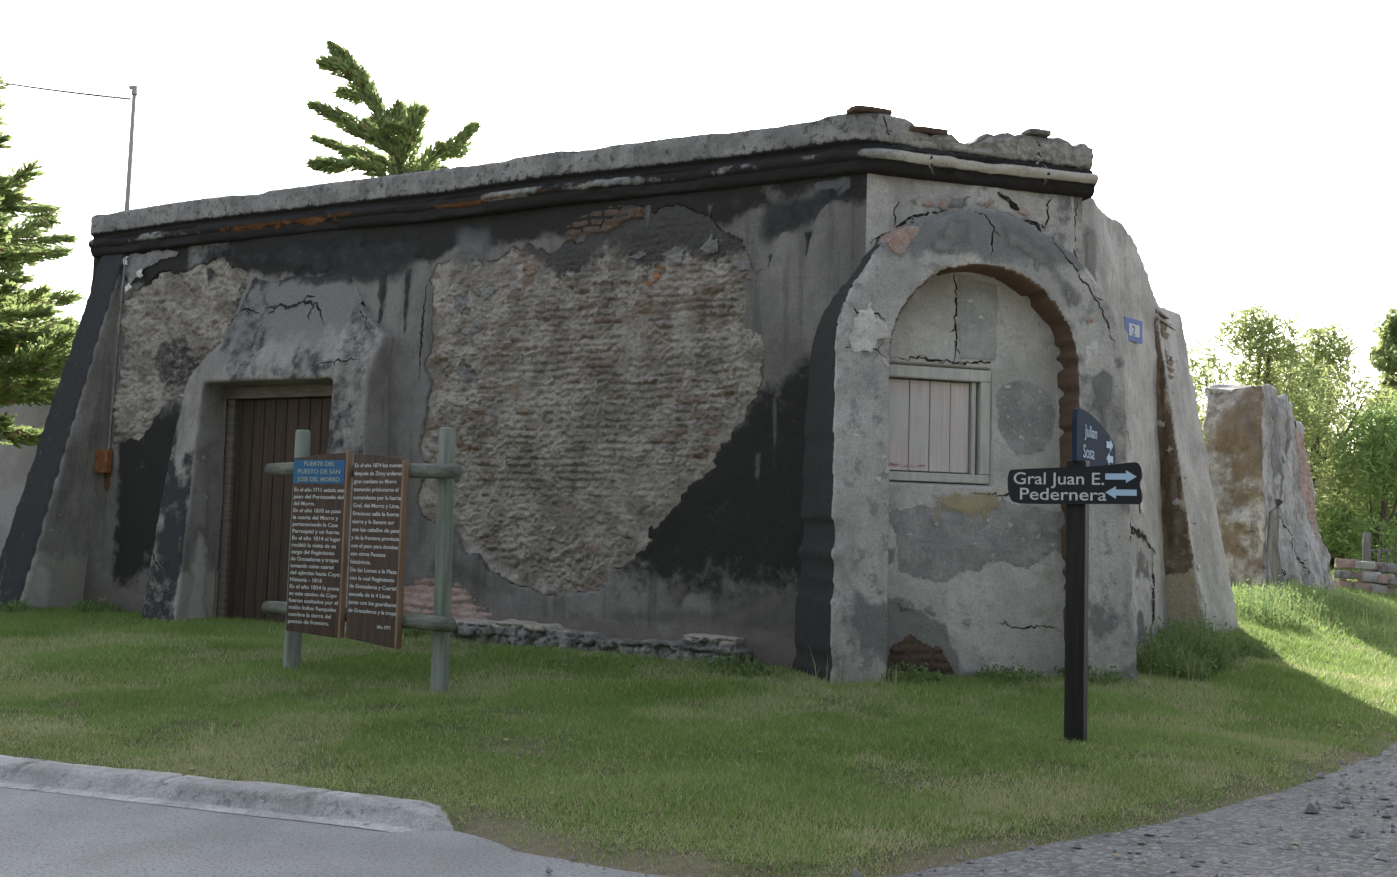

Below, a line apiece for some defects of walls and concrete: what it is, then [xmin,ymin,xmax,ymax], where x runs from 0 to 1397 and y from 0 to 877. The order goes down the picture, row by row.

spalling [877,226,919,256]
crack [870,142,1115,349]
spalling [113,249,248,444]
crack [235,294,326,351]
crack [317,301,371,366]
peeling [848,302,892,367]
spalling [418,205,765,596]
water stain [936,494,998,520]
peeling [186,534,208,620]
spalling [403,578,434,634]
spalling [450,583,492,634]
spalling [887,634,956,677]